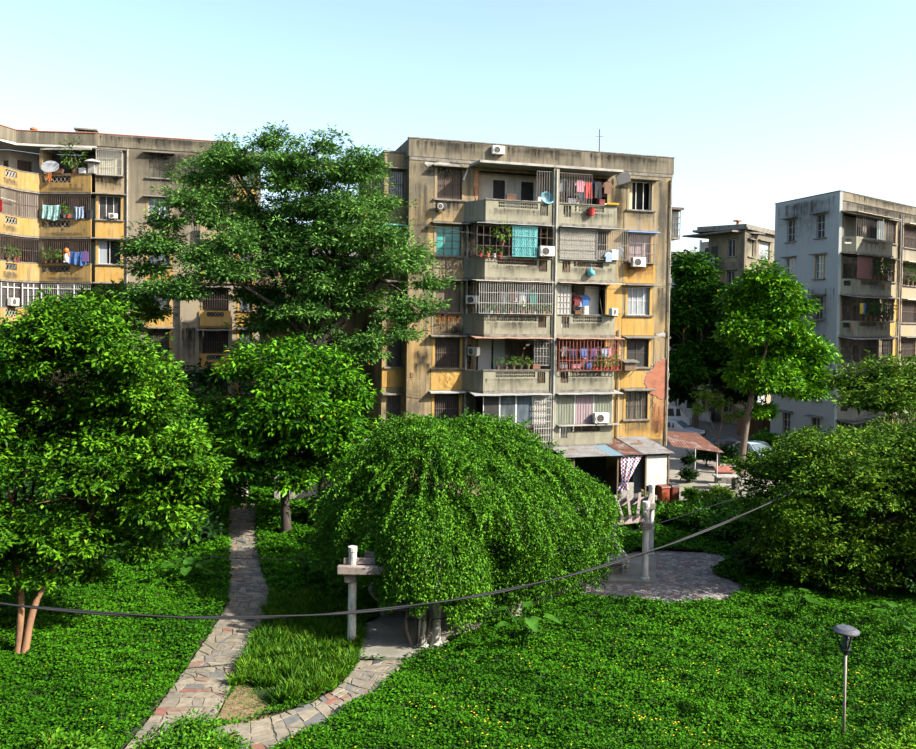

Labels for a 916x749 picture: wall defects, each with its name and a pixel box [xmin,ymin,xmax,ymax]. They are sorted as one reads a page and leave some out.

flaking render [644,358,669,424]